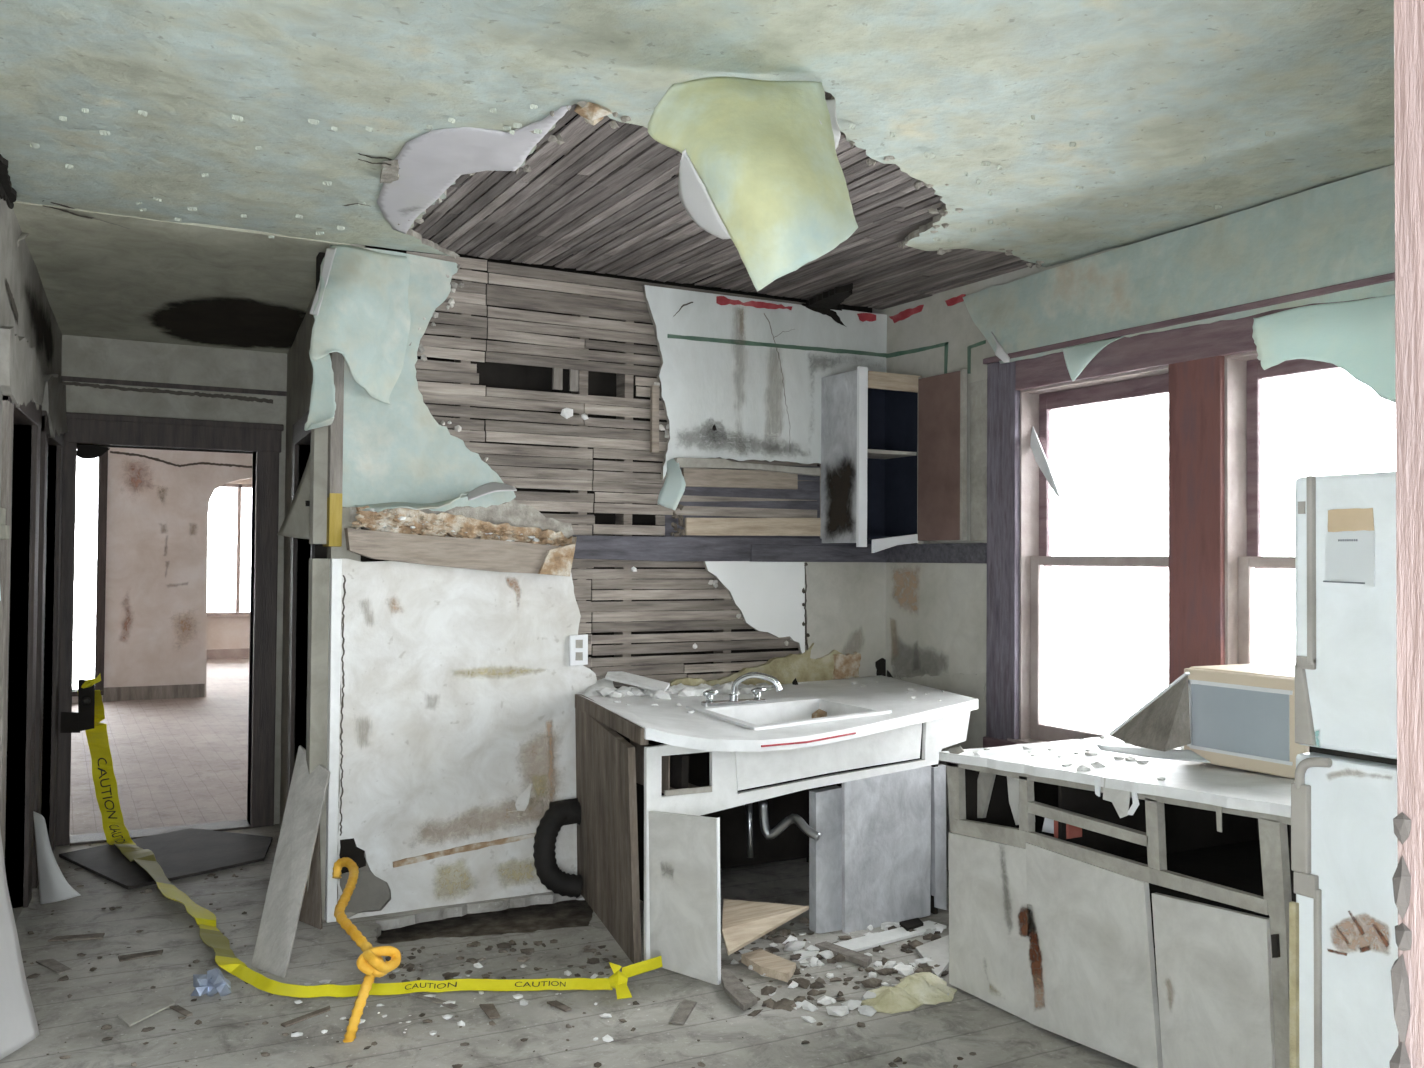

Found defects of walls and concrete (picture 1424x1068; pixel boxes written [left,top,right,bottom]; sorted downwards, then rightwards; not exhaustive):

flaking render [0,154,17,209]
leakage [149,298,306,348]
flaking render [351,101,1044,702]
flaking render [339,833,536,913]
corrosion [1018,907,1044,1008]